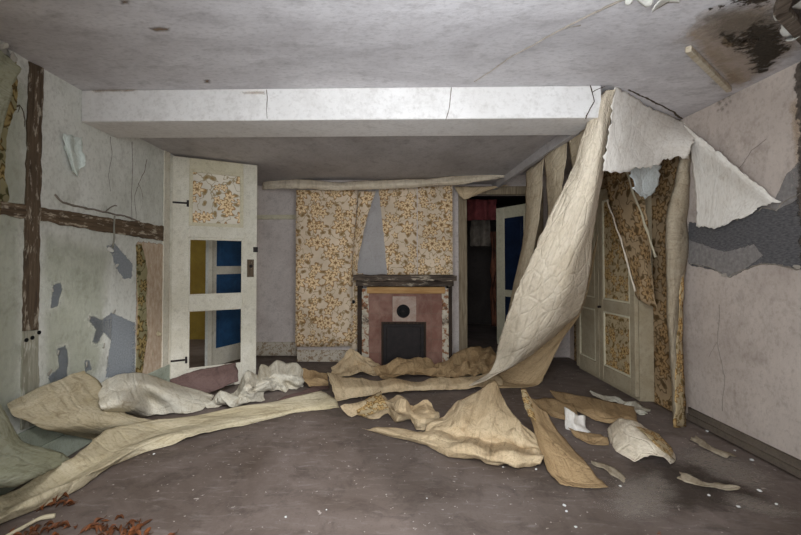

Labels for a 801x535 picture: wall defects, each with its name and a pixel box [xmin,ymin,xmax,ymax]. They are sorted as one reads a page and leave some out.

crack [474,0,625,82]
flaking render [625,0,680,12]
flaking render [773,16,798,41]
flaking render [51,282,62,308]
peeling [88,241,169,378]
peeling [357,189,387,275]
peeling [508,129,585,312]
flaking render [603,87,801,428]
flaking render [47,346,68,383]